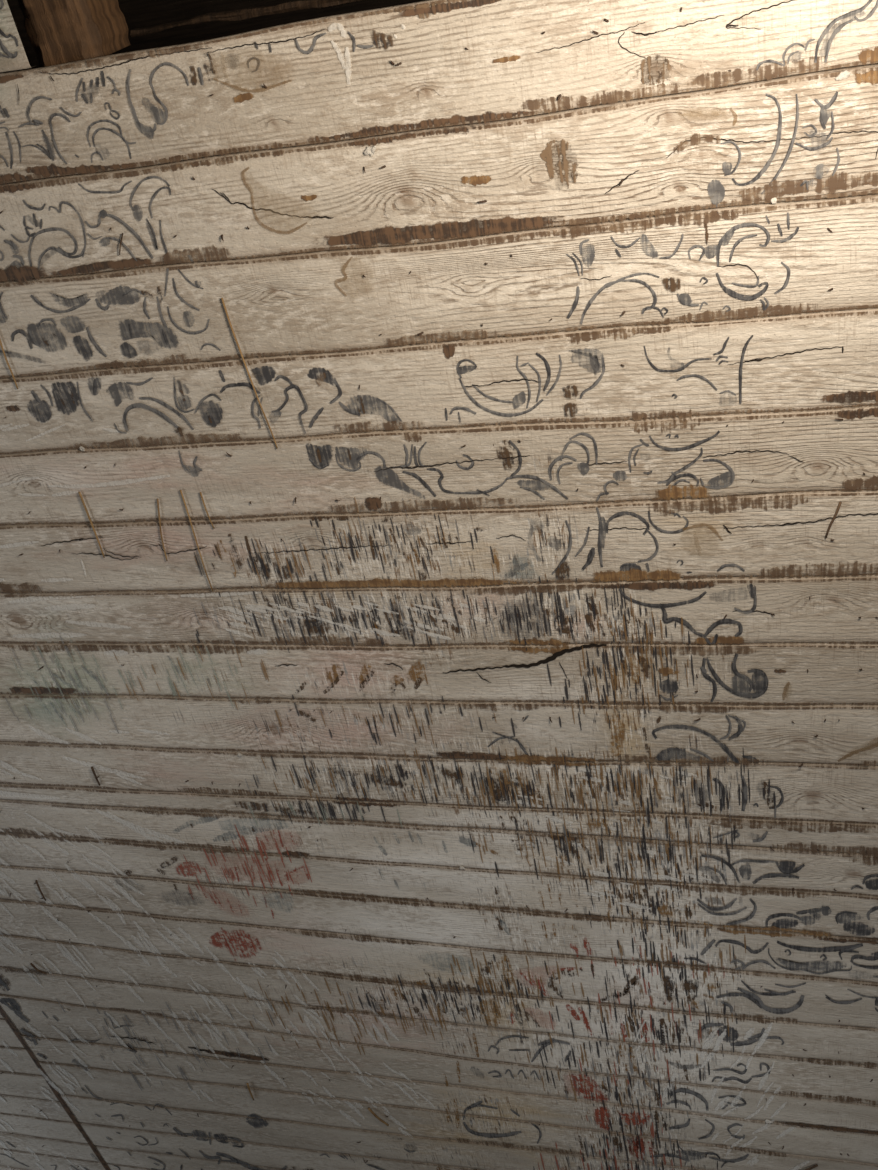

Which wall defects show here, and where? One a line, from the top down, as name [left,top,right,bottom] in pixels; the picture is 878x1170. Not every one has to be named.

crack [212,189,334,219]
crack [443,643,607,683]